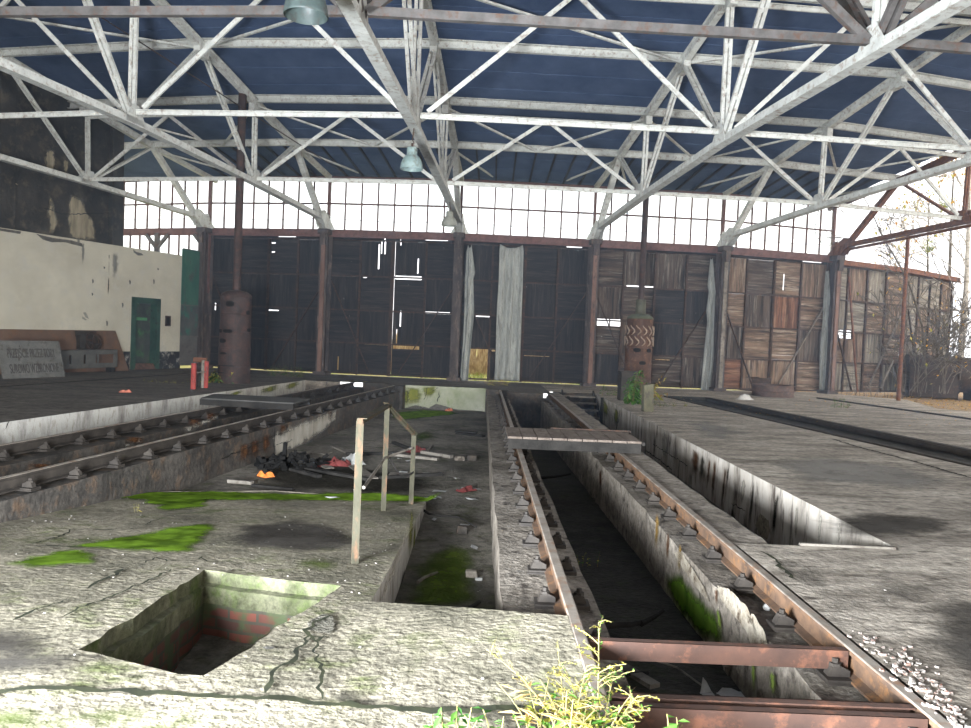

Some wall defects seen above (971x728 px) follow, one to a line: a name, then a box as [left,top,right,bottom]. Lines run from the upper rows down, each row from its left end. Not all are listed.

crack [13,528,249,620]
crack [0,615,523,714]